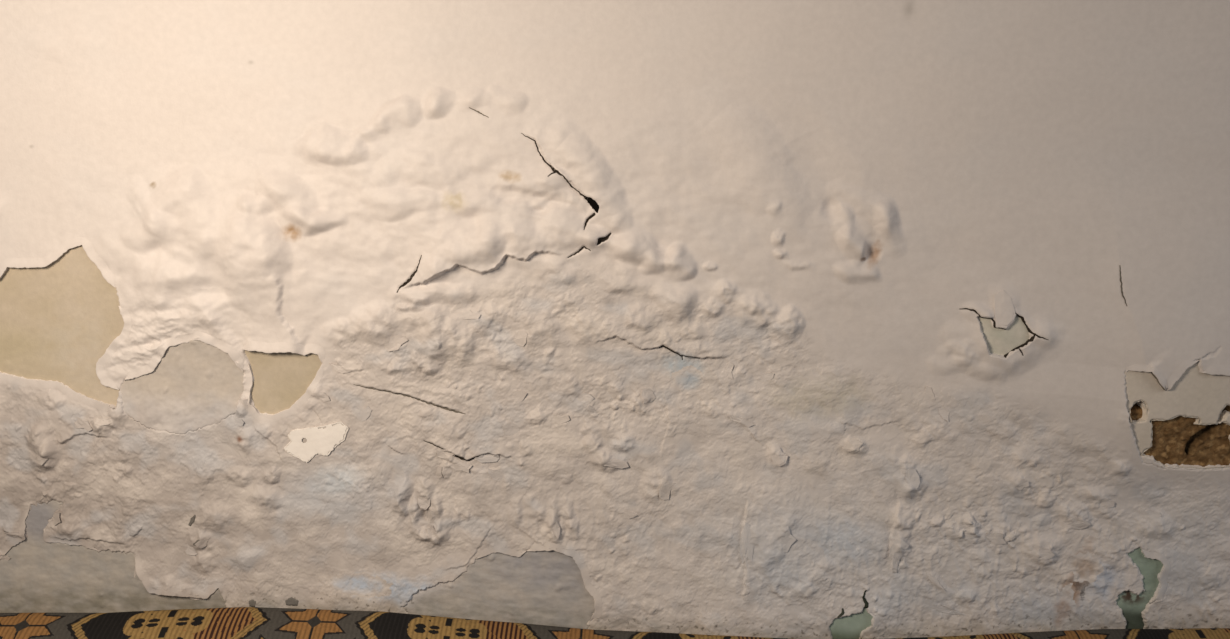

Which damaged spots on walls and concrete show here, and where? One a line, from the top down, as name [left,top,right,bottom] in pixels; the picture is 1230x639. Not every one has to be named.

crack [521,133,611,258]
crack [397,255,422,292]
peeling [0,237,326,434]
crack [962,308,1048,358]
peeling [1125,360,1230,470]
peeling [403,543,602,629]
peeling [829,608,879,639]
peeling [1116,548,1171,629]